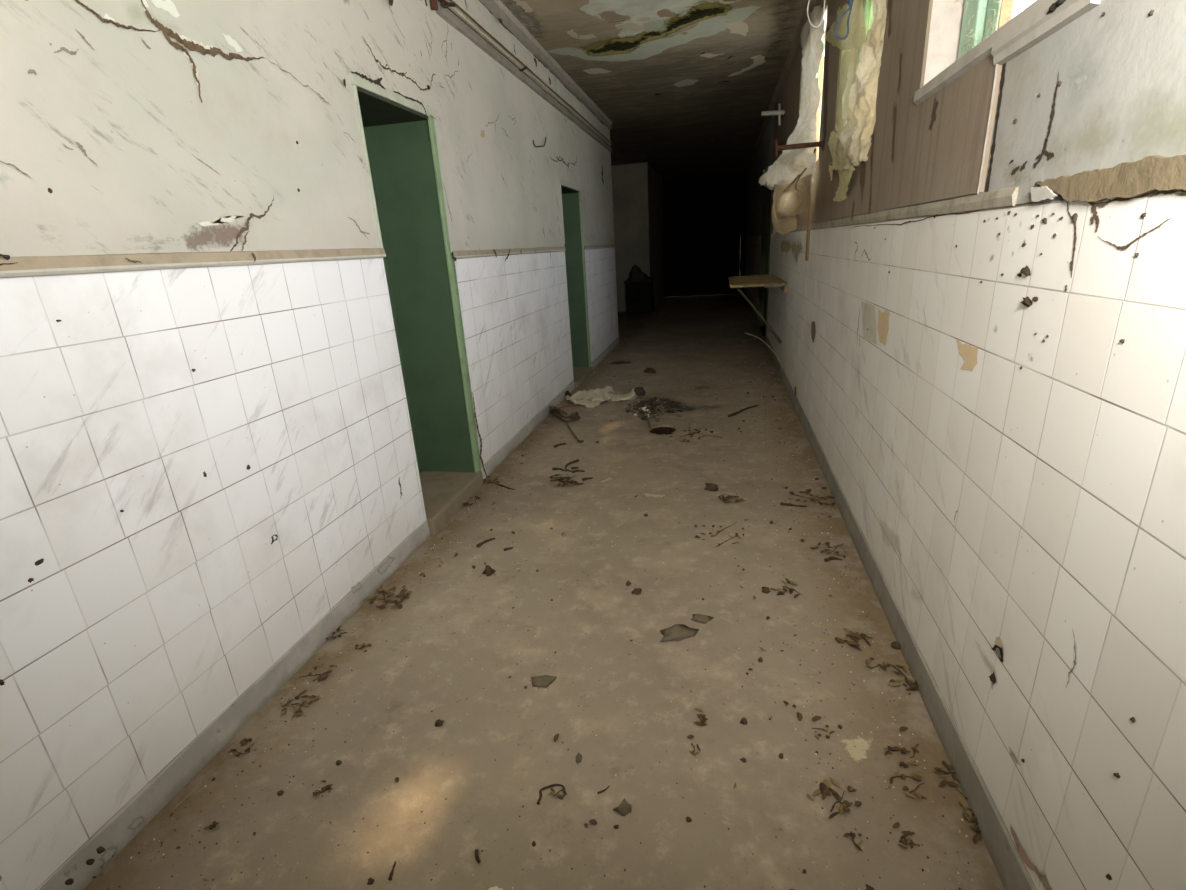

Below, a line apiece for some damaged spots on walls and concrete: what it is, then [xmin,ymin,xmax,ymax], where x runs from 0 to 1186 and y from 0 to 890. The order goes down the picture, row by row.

peeling [547,0,761,74]
crack [28,0,604,140]
peeling [728,55,765,77]
crack [62,142,98,167]
crack [853,63,1173,293]
spalling [1031,155,1186,204]
peeling [861,302,890,345]
peeling [956,340,978,372]